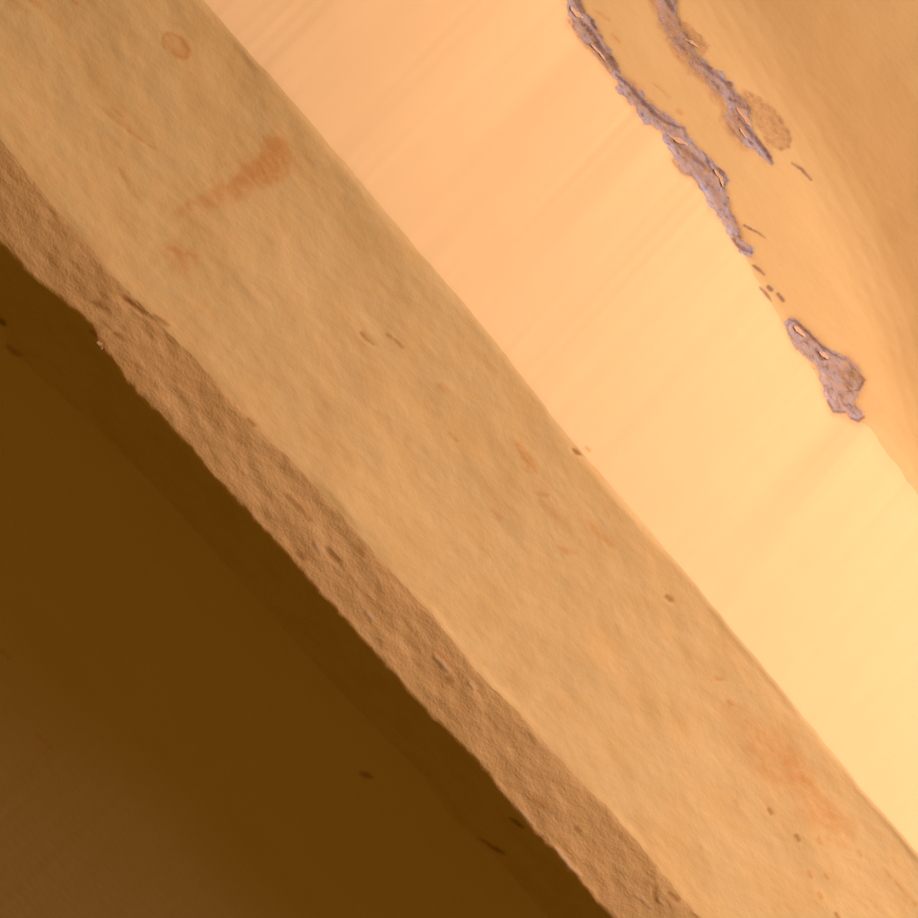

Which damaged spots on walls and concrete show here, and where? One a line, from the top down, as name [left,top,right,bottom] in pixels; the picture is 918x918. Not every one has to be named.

peeling [568,0,761,272]
peeling [654,0,787,165]
peeling [785,319,865,422]